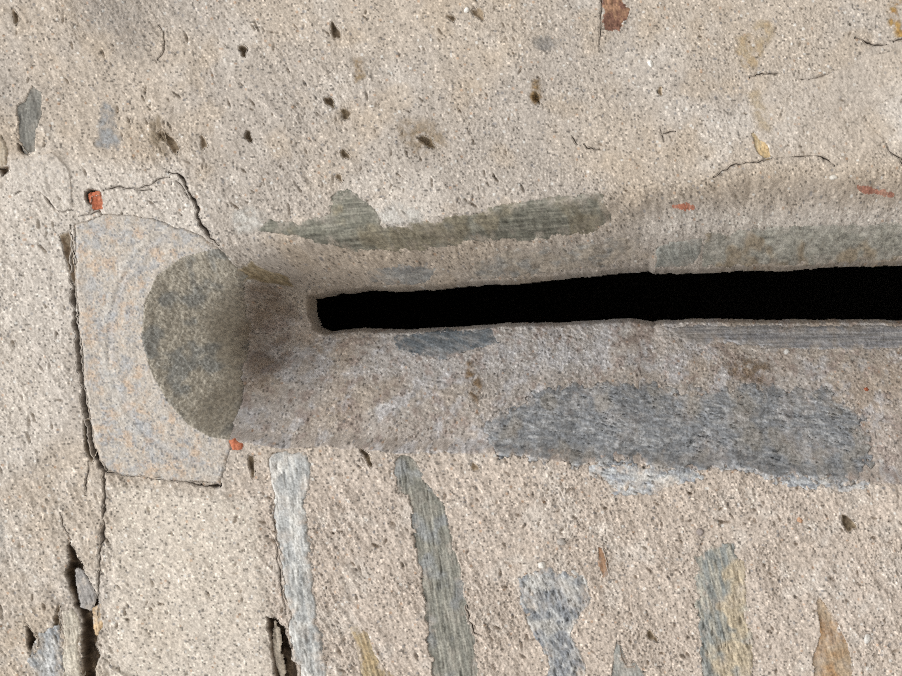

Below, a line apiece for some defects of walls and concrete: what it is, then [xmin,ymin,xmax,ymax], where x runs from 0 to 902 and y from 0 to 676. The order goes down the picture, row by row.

crack [855,37,902,58]
crack [714,153,835,178]
crack [886,144,902,166]
crack [16,171,221,599]